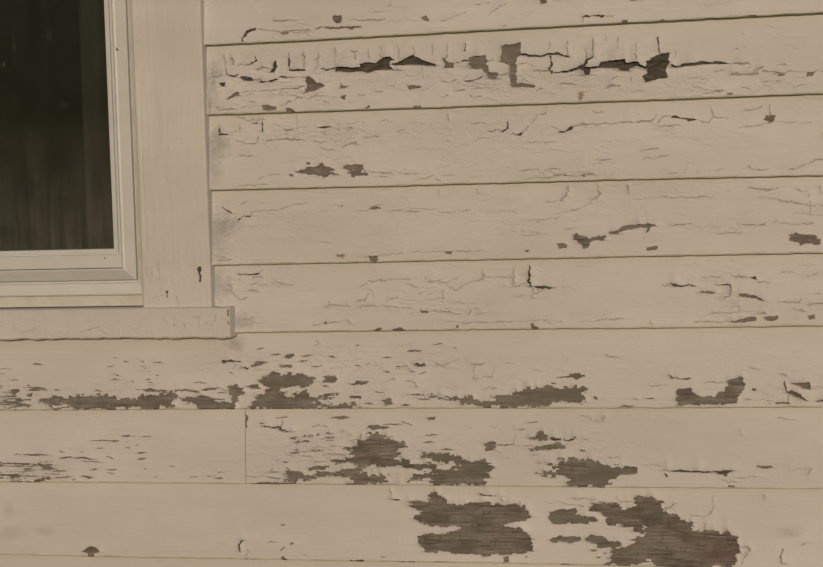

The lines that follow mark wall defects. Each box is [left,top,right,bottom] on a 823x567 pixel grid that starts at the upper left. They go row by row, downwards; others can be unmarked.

crack [582,14,614,22]
peeling [207,35,675,157]
crack [267,114,405,150]
crack [474,105,811,143]
peeling [288,159,371,178]
crack [338,159,612,233]
crack [718,159,823,234]
peeling [557,213,659,249]
peeling [789,231,820,246]
crack [325,265,566,309]
peeling [762,373,823,405]
peeling [0,346,760,567]